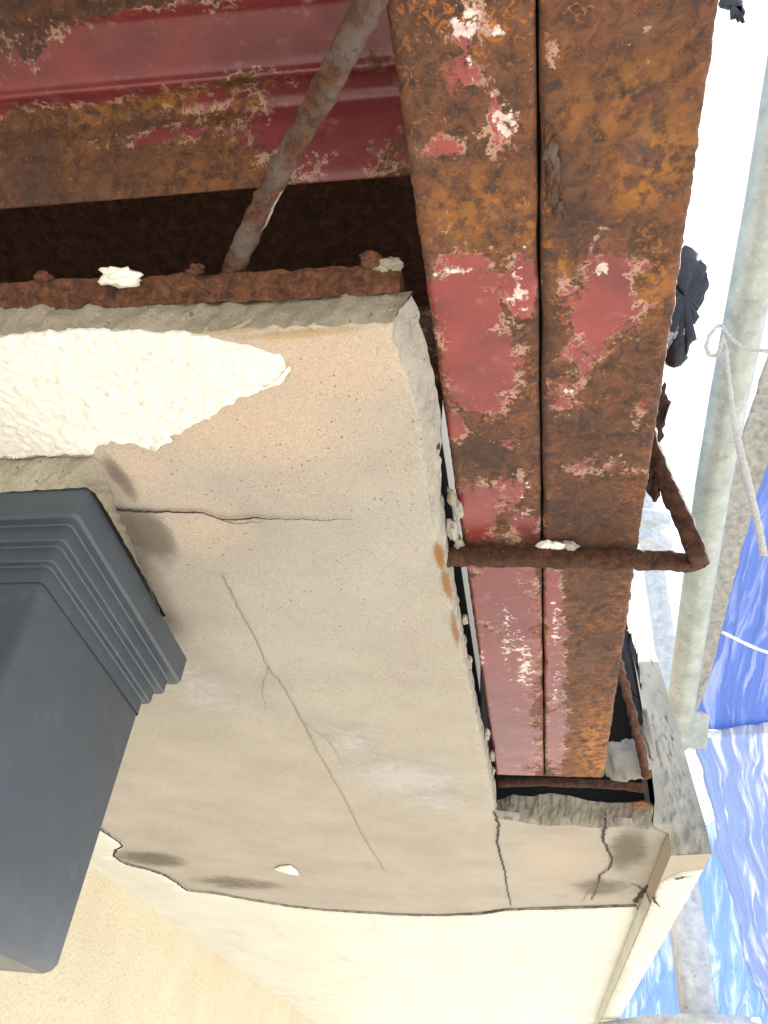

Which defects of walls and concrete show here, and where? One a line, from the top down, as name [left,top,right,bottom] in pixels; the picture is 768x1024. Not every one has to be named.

corrosion [655,382,671,444]
crack [116,508,351,524]
peeling [0,291,654,829]
corrosion [435,545,452,597]
corrosion [646,466,660,502]
crack [221,575,382,868]
leakage [128,855,176,865]
crack [493,812,511,905]
crack [582,805,613,903]
peeling [89,829,703,1024]